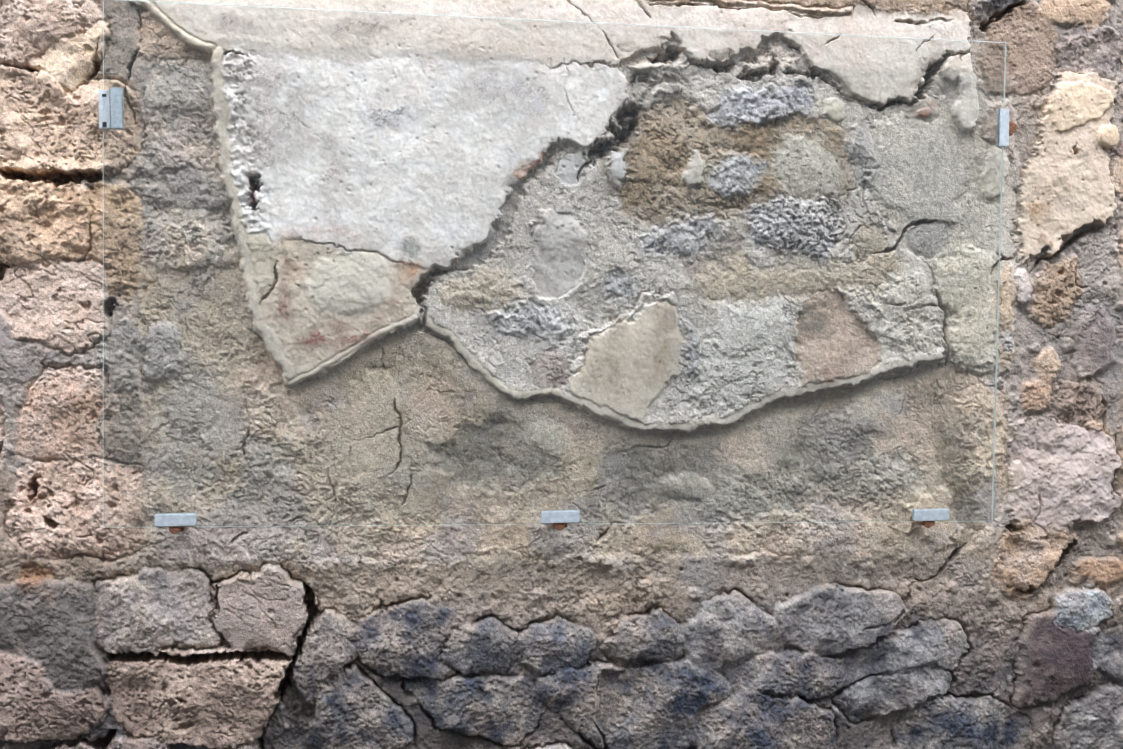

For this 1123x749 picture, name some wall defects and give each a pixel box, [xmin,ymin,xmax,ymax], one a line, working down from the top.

crack [77,38,101,89]
crack [124,11,143,127]
crack [259,0,962,330]
spalling [421,33,979,425]
crack [380,347,388,373]
crack [879,376,906,417]
crack [884,265,973,391]
crack [288,399,421,533]
crack [228,532,249,547]